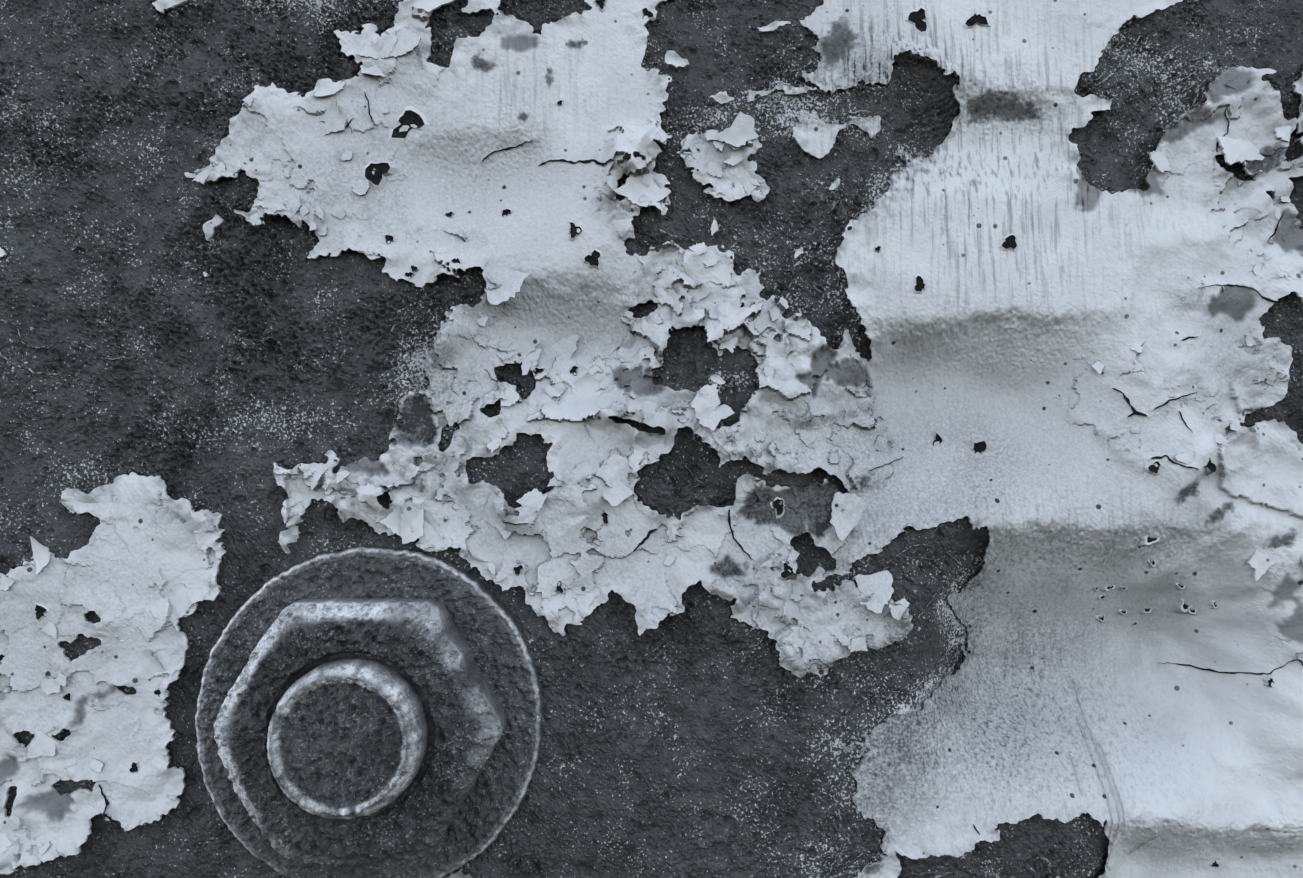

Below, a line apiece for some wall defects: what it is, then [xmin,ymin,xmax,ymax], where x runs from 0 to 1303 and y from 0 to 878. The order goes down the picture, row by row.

spalling [998,233,1018,252]
peeling [1052,0,1303,504]
peeling [0,0,991,878]
crack [1163,659,1303,675]
peeling [1215,531,1303,688]
peeling [896,813,1110,878]